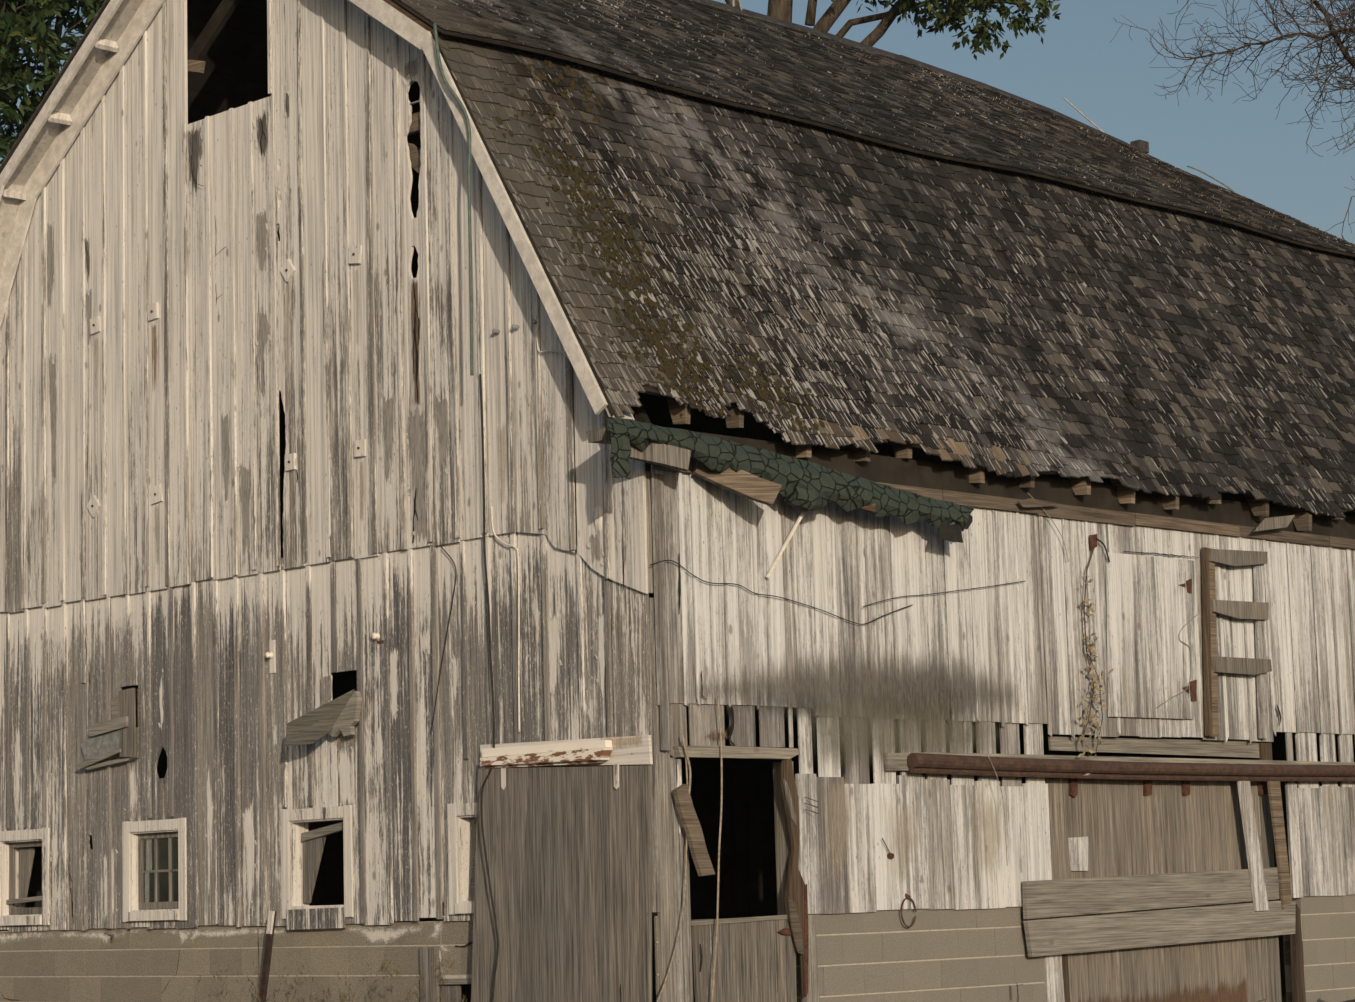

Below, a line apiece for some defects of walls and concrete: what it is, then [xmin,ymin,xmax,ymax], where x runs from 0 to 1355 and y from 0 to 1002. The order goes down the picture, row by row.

peeling [187,127,202,193]
peeling [252,111,268,162]
peeling [47,223,56,308]
peeling [83,238,92,349]
peeling [254,210,268,271]
peeling [49,354,58,483]
peeling [221,412,252,554]
peeling [13,722,23,805]
peeling [123,765,138,820]
peeling [196,769,214,896]
peeling [242,800,257,910]
peeling [375,648,400,771]